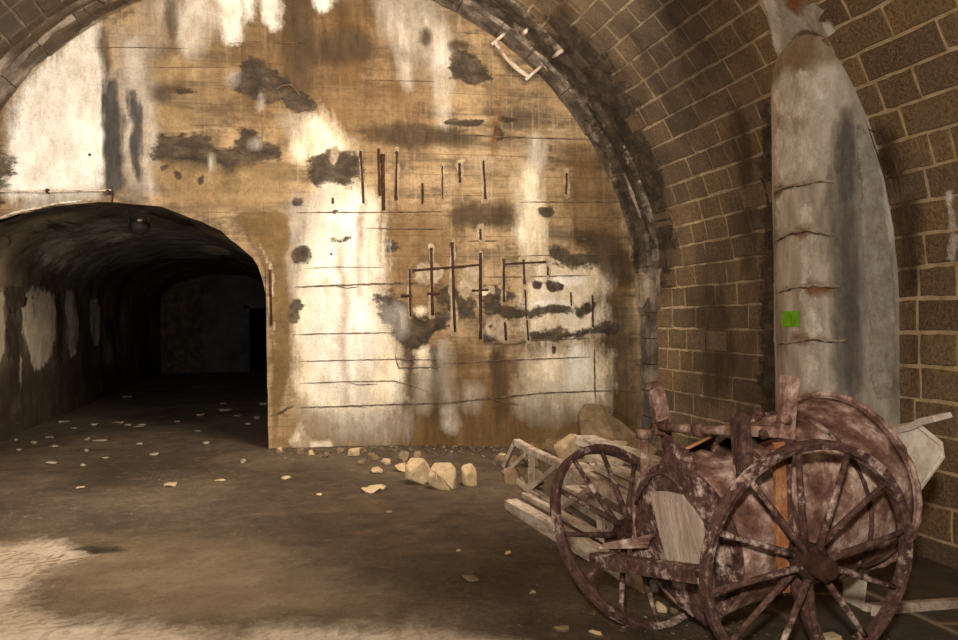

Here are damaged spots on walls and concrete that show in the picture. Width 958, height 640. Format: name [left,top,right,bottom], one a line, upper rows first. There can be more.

rust [359,150,367,205]
rust [378,147,400,211]
rust [441,158,465,200]
rust [478,156,490,204]
crack [773,180,834,196]
damp [0,0,632,447]
crack [774,228,831,243]
damp [946,191,958,259]
spalling [414,262,444,284]
spalling [458,262,489,299]
crack [775,283,840,294]
spalling [486,315,514,342]